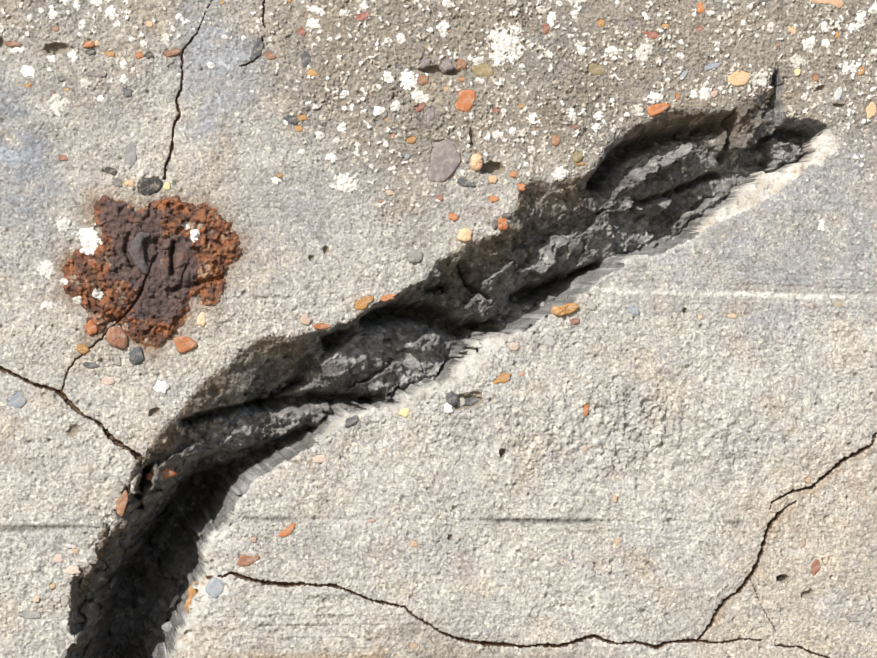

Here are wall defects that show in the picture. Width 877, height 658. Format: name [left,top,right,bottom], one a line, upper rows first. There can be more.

crack [163,0,213,179]
crack [240,0,266,67]
spalling [412,65,463,76]
corrosion [60,195,243,350]
crack [0,275,147,464]
spalling [64,68,837,658]
crack [205,432,877,658]